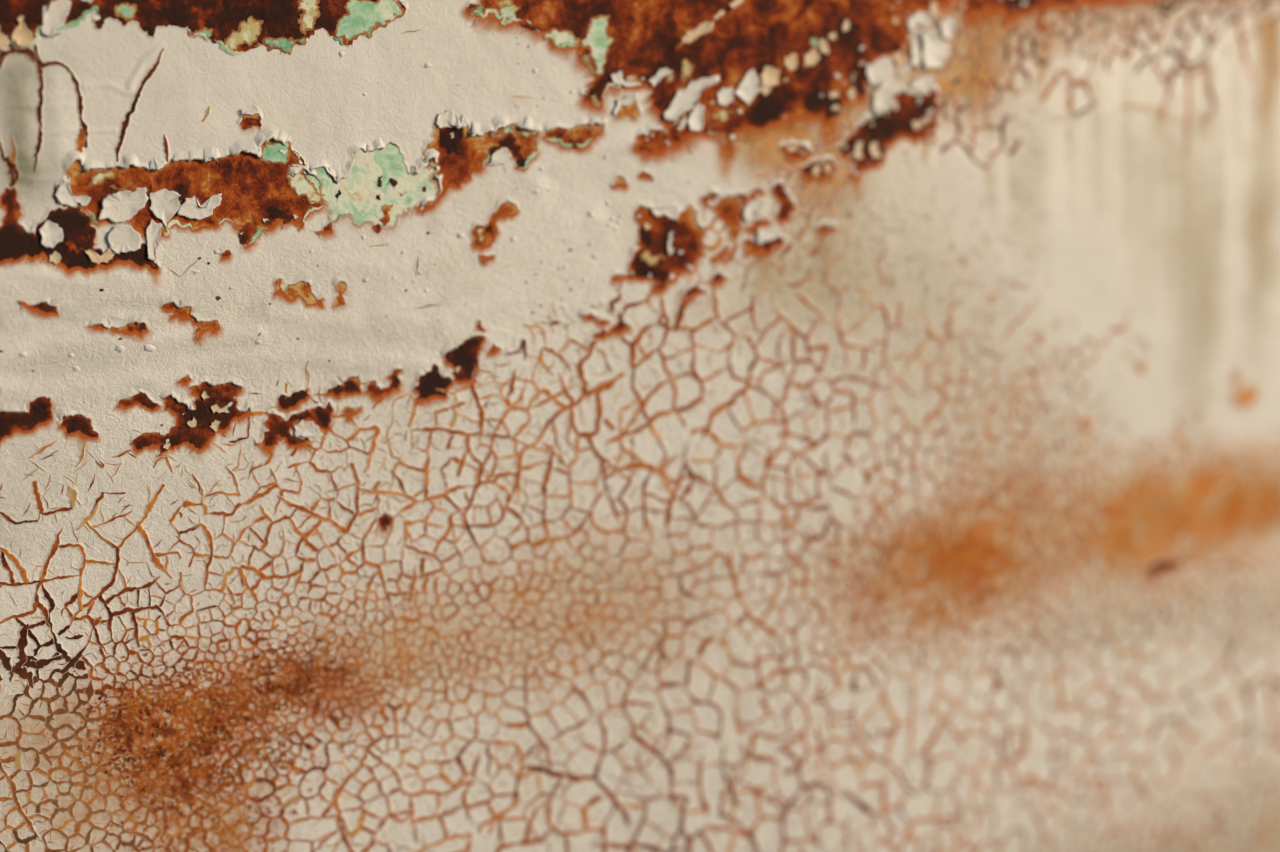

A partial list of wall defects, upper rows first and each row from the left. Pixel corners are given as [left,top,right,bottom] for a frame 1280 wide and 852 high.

crack [400,27,421,35]
rust [914,19,1050,109]
peeling [0,0,1154,309]
rust [720,114,858,207]
crack [753,161,851,239]
crack [888,0,1280,222]
peeling [87,314,150,340]
peeling [159,296,221,342]
peeling [0,393,101,445]
peeling [116,318,504,456]
crack [0,206,1280,852]
rust [74,554,679,852]